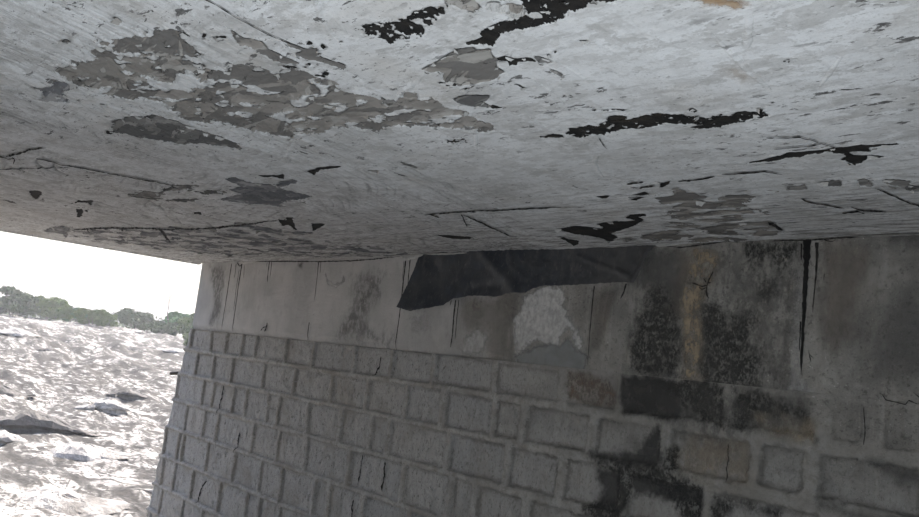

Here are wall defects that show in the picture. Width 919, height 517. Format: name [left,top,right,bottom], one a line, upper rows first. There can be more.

peeling [31,0,615,150]
peeling [540,108,768,139]
peeling [749,143,899,165]
peeling [127,174,312,215]
peeling [554,182,785,246]
peeling [856,179,919,194]
peeling [44,217,410,257]
damp [745,241,802,269]
damp [583,248,809,517]